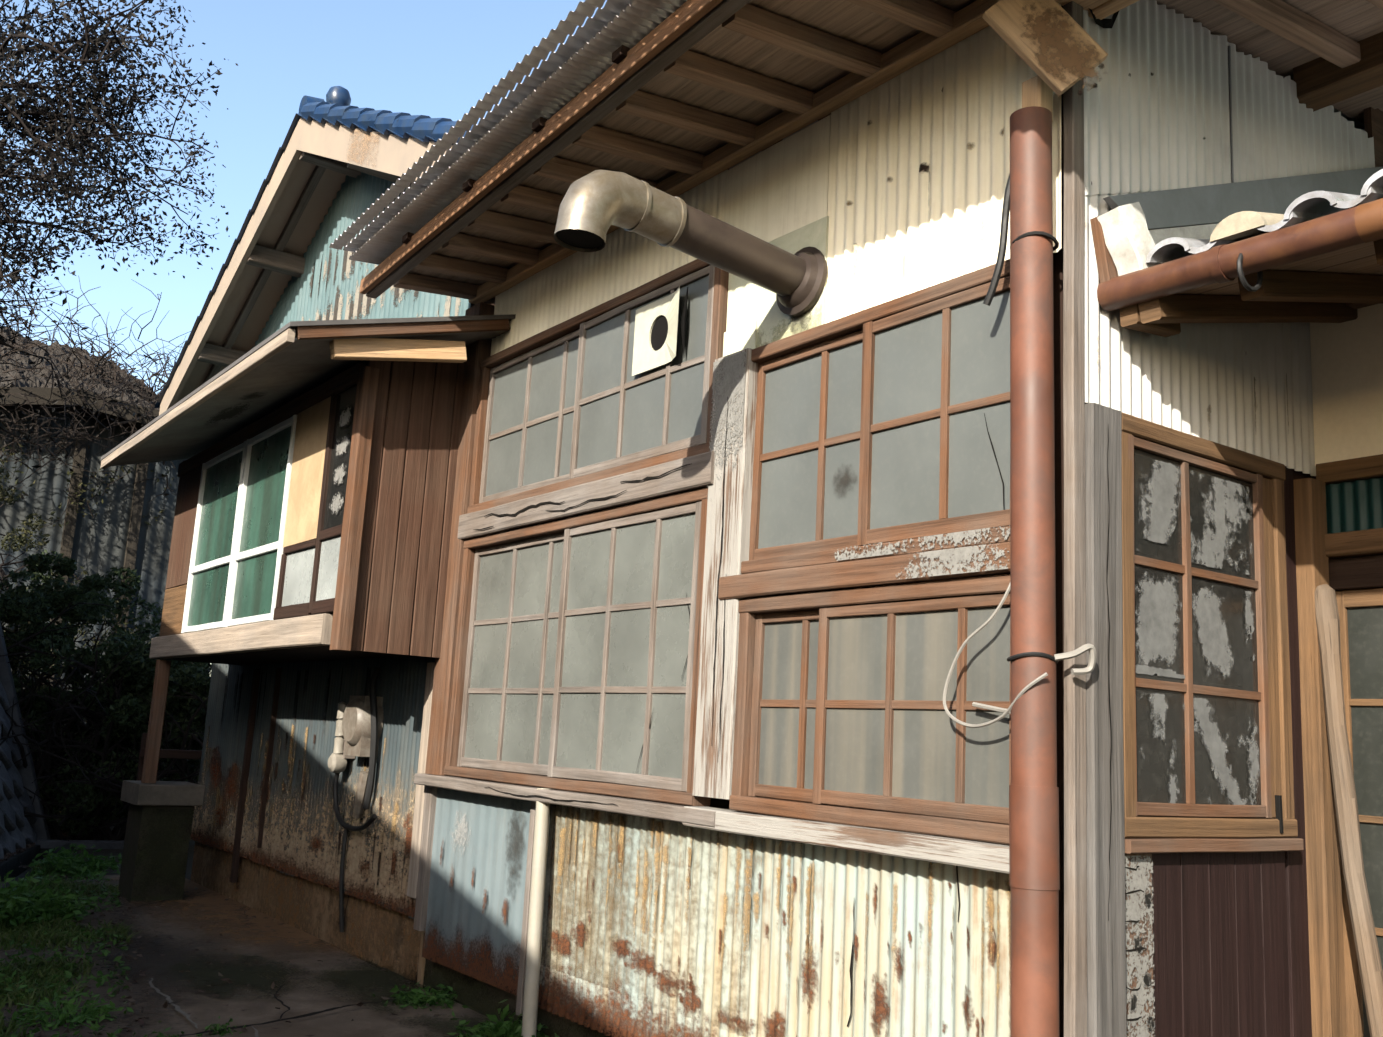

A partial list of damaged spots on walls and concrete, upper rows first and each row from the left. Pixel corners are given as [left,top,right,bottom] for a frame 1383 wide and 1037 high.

peeling [835,526,1010,580]
corrosion [190,724,520,995]
corrosion [538,804,797,1037]
corrosion [718,837,952,1036]
corrosion [963,985,984,1037]
corrosion [950,879,1011,1004]